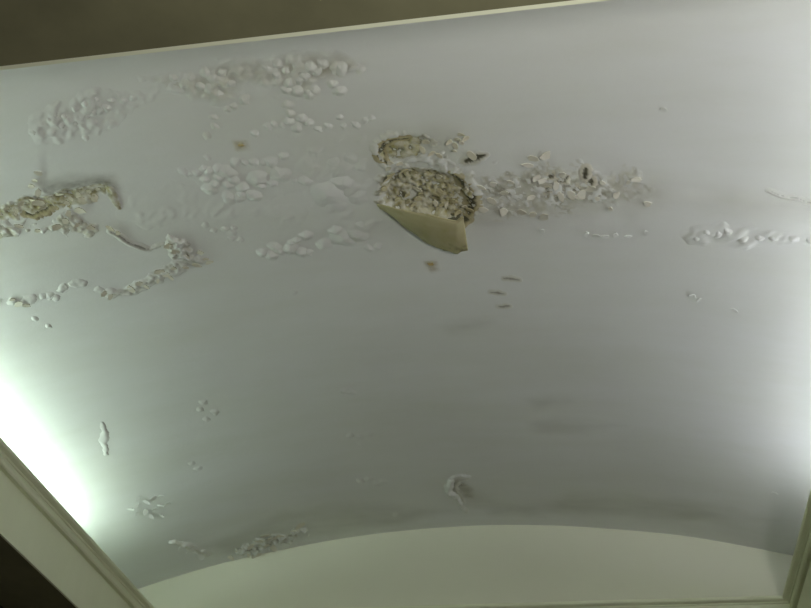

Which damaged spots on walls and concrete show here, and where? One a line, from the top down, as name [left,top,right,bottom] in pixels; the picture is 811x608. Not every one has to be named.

flaking render [0,171,213,328]
peeling [369,130,656,254]